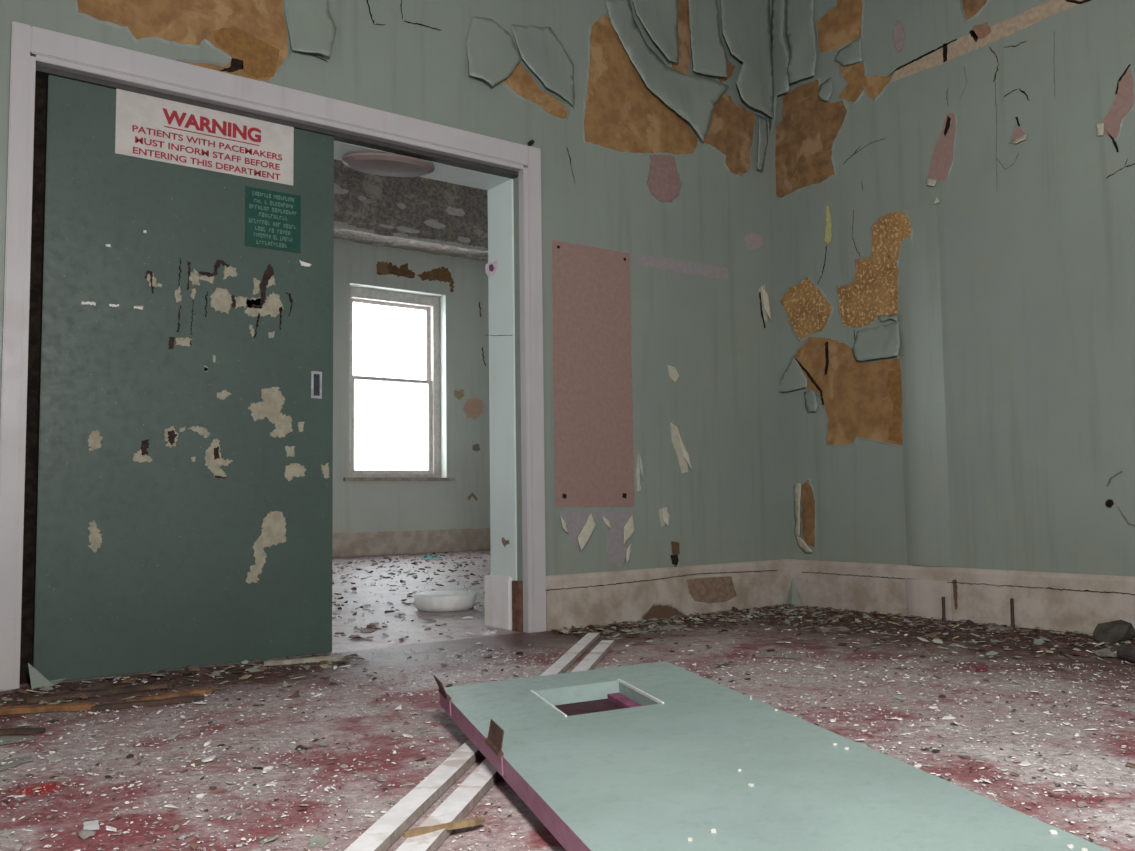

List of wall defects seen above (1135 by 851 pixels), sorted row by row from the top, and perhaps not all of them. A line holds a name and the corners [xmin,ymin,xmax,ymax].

flaking render [73,0,337,83]
flaking render [466,0,1092,204]
peeling [1096,64,1135,152]
spalling [145,270,162,294]
spalling [168,260,284,349]
flaking render [375,260,456,294]
flaking render [758,209,913,448]
spalling [248,387,306,481]
flaking render [453,388,485,421]
spalling [246,511,286,584]
flaking render [794,478,817,553]
peeling [687,576,737,604]